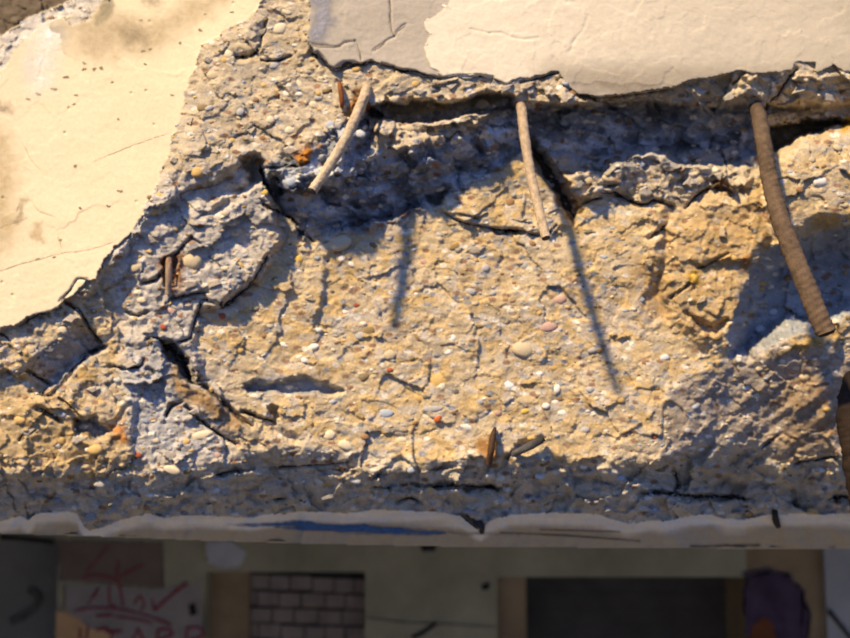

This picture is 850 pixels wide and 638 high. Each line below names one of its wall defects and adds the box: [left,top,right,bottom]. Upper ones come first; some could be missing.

damp [100,0,113,15]
rust [346,88,362,116]
crack [261,163,307,222]
crack [533,148,718,219]
spalling [0,0,850,479]
rust [159,255,183,290]
crack [147,255,274,426]
crack [165,401,236,445]